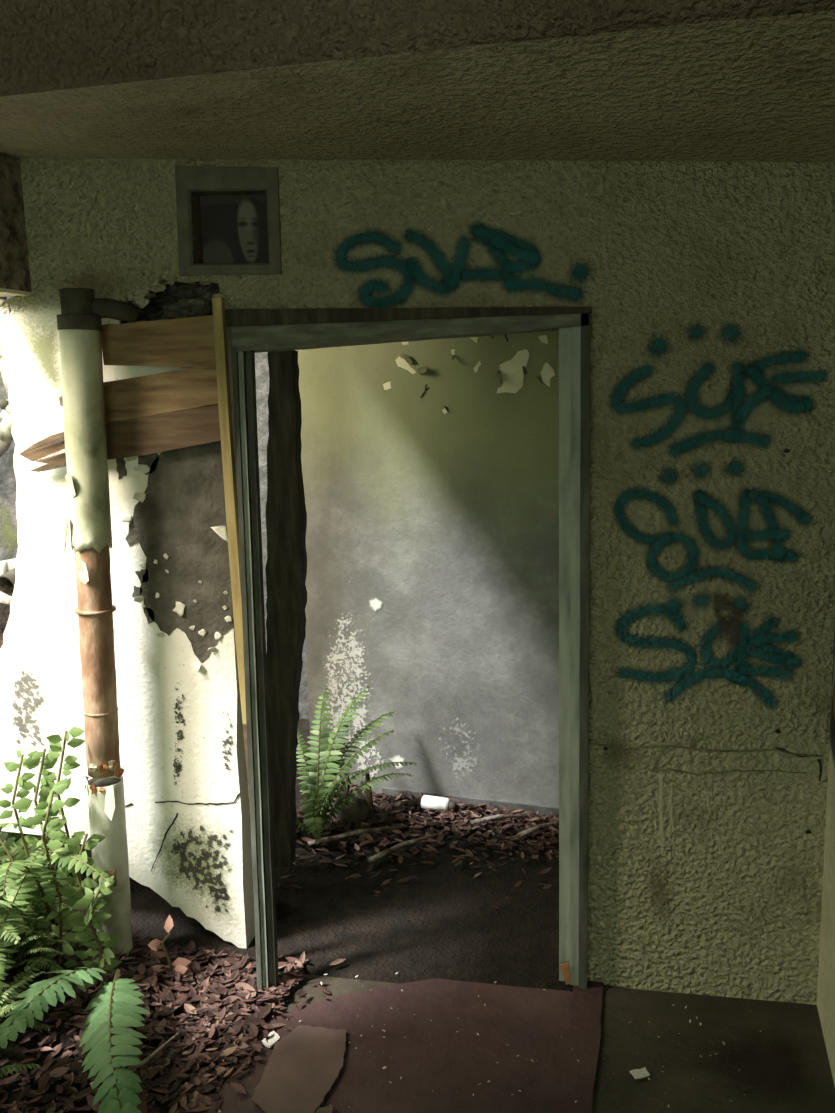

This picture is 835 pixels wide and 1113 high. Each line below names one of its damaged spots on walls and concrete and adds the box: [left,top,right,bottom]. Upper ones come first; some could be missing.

flaking render [121,278,226,324]
peeling [395,342,427,375]
peeling [497,349,555,393]
peeling [116,441,234,671]
rust [74,545,121,779]
damp [320,613,384,777]
crack [591,732,823,781]
crack [125,793,241,872]
damp [164,825,233,913]